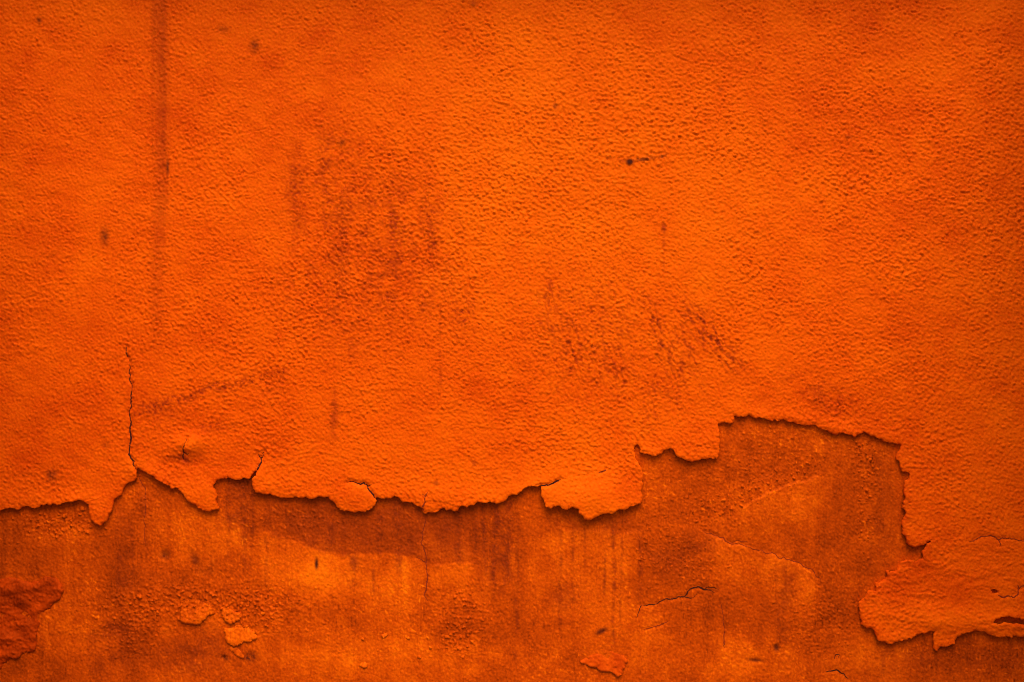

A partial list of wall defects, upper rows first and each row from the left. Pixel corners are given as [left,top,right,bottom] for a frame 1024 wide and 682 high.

crack [126,347,146,546]
peeling [0,415,1024,682]
crack [637,586,725,648]